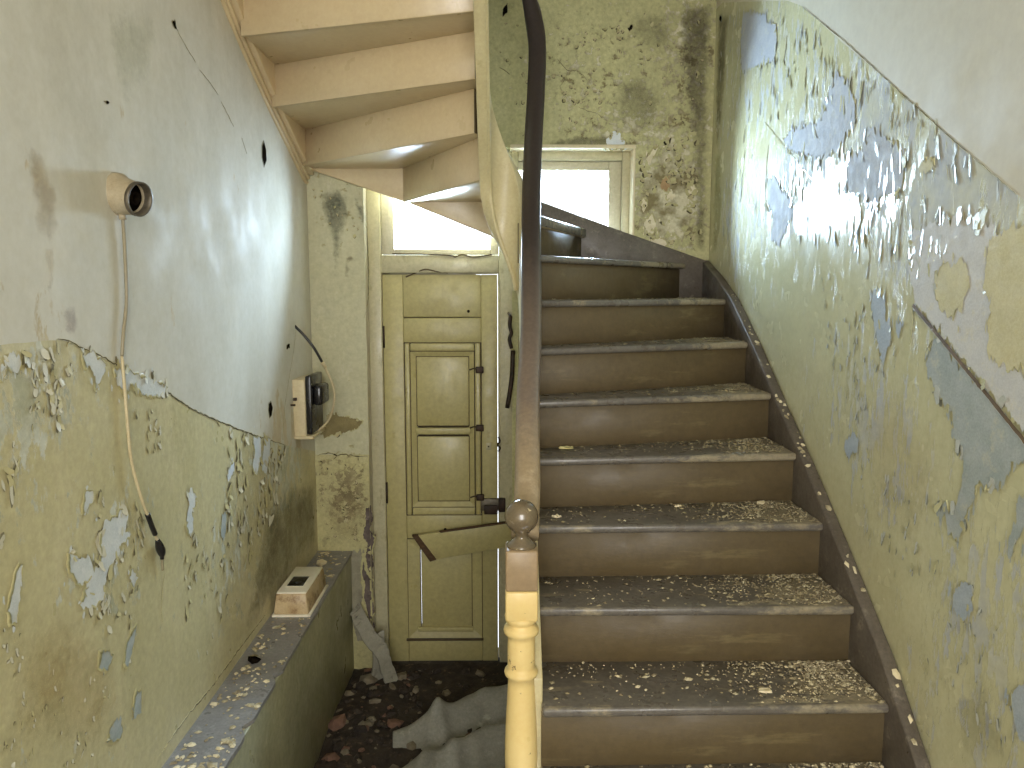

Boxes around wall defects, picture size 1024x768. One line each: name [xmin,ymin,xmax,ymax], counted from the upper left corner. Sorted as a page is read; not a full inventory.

peeling [603,130,626,151]
leakage [326,195,345,239]
peeling [717,8,1024,550]
peeling [0,339,169,454]
flaking render [320,412,363,438]
peeling [2,561,24,678]
peeling [64,485,146,699]
peeling [106,688,142,745]
peeling [184,426,286,655]
peeling [317,461,376,641]
peeling [924,580,1024,750]